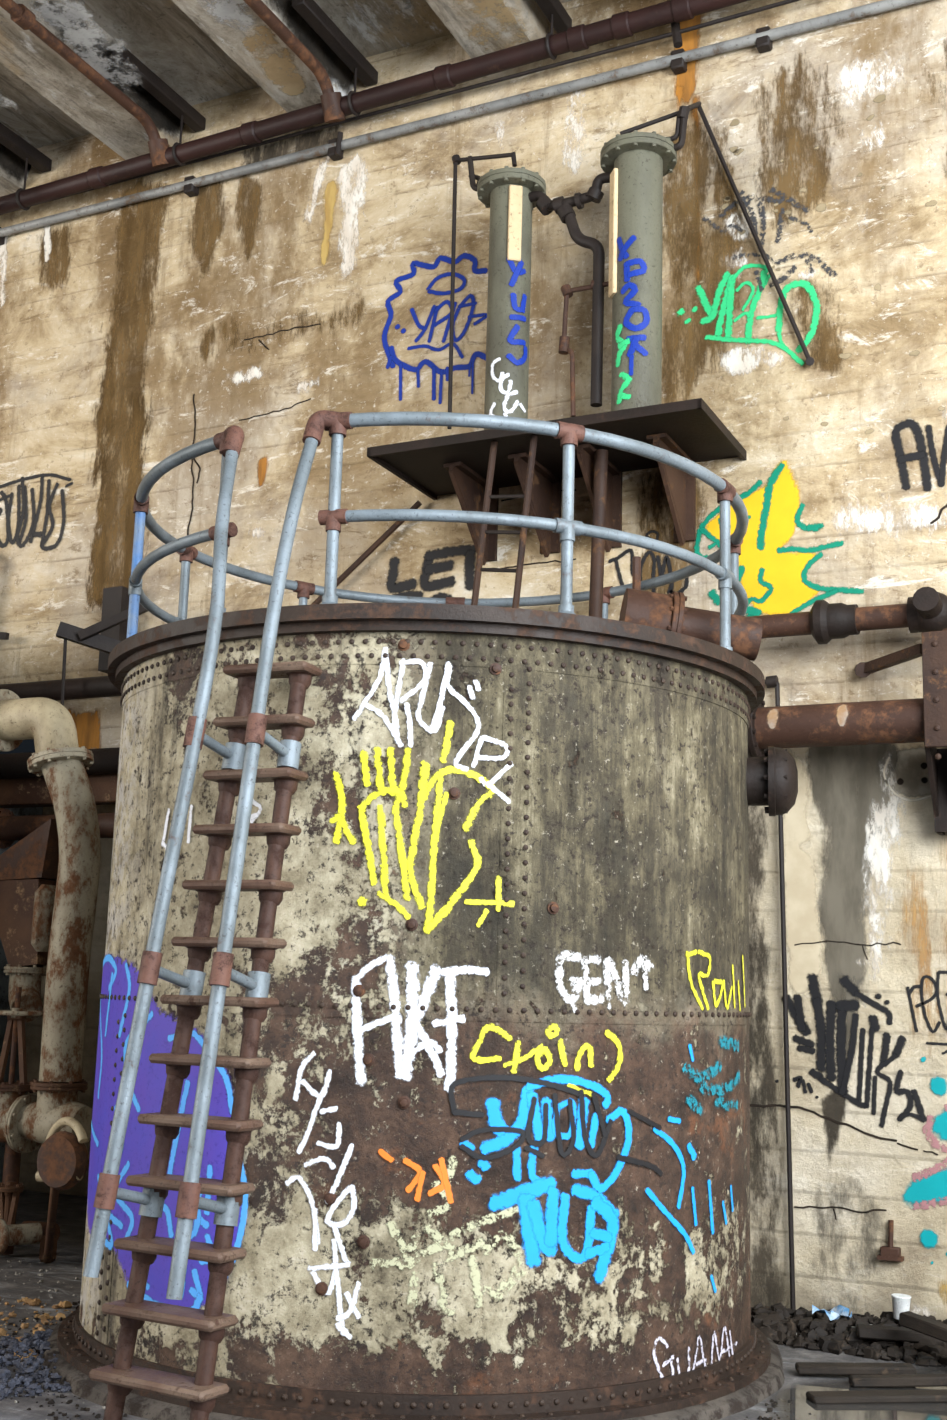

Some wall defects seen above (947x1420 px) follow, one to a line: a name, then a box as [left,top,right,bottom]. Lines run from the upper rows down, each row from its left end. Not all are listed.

water stain [86,178,169,609]
water stain [189,125,367,276]
water stain [662,121,741,403]
water stain [758,54,903,229]
corrosion [68,709,101,749]
water stain [808,744,902,1061]